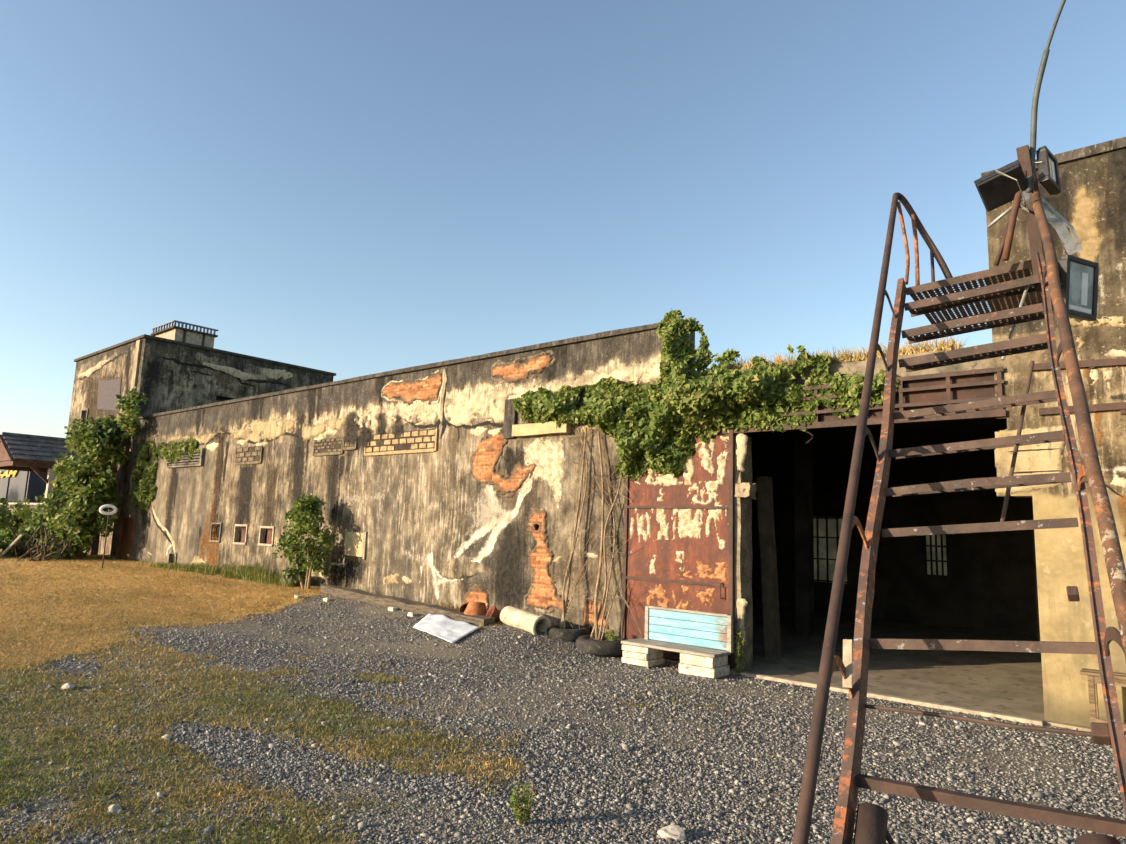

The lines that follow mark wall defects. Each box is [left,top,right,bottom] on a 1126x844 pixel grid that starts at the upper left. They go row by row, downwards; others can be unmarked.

water stain [1036,148,1126,262]
water stain [141,509,150,545]
water stain [163,468,178,537]
water stain [210,388,321,534]
water stain [327,455,344,523]
water stain [332,557,365,587]
water stain [344,376,402,457]
flaking render [168,350,661,498]
water stain [406,552,463,599]
water stain [454,438,564,607]
flaking render [524,508,609,630]
peeling [630,433,757,613]